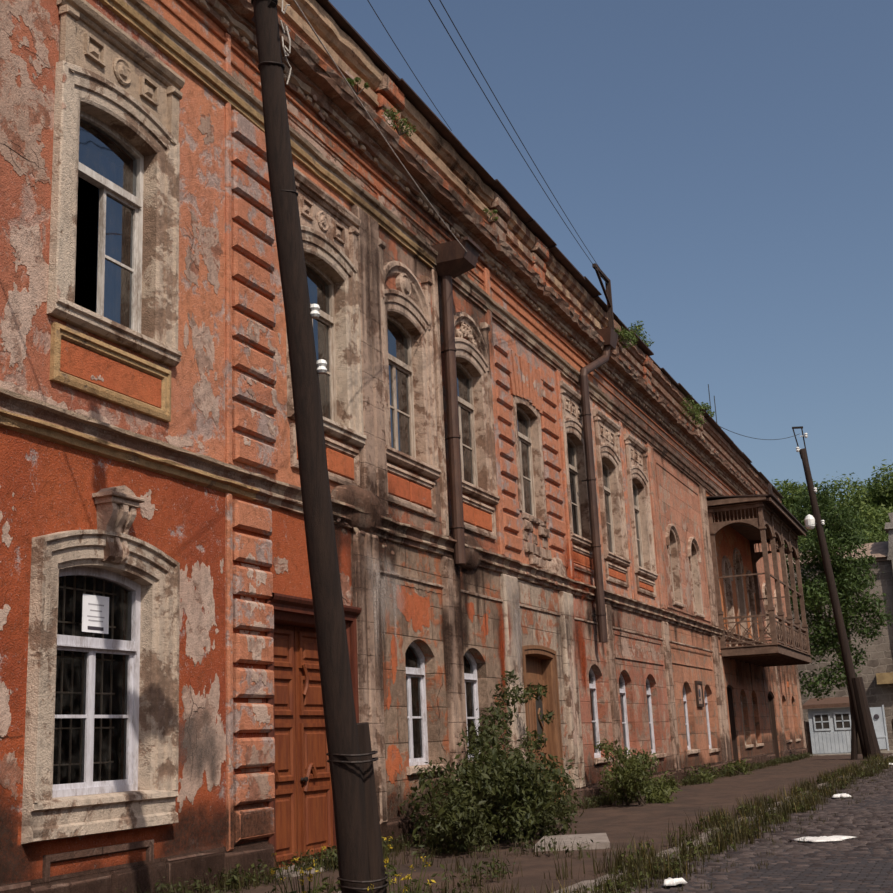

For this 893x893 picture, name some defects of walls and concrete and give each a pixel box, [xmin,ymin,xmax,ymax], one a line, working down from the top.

peeling [0,0,67,189]
peeling [0,224,61,372]
peeling [184,211,223,294]
water stain [360,239,387,337]
peeling [0,380,111,424]
peeling [180,313,220,425]
peeling [0,492,14,547]
peeling [0,604,11,631]
peeling [178,558,224,667]
peeling [0,681,12,740]
peeling [0,751,23,800]
peeling [177,673,273,818]